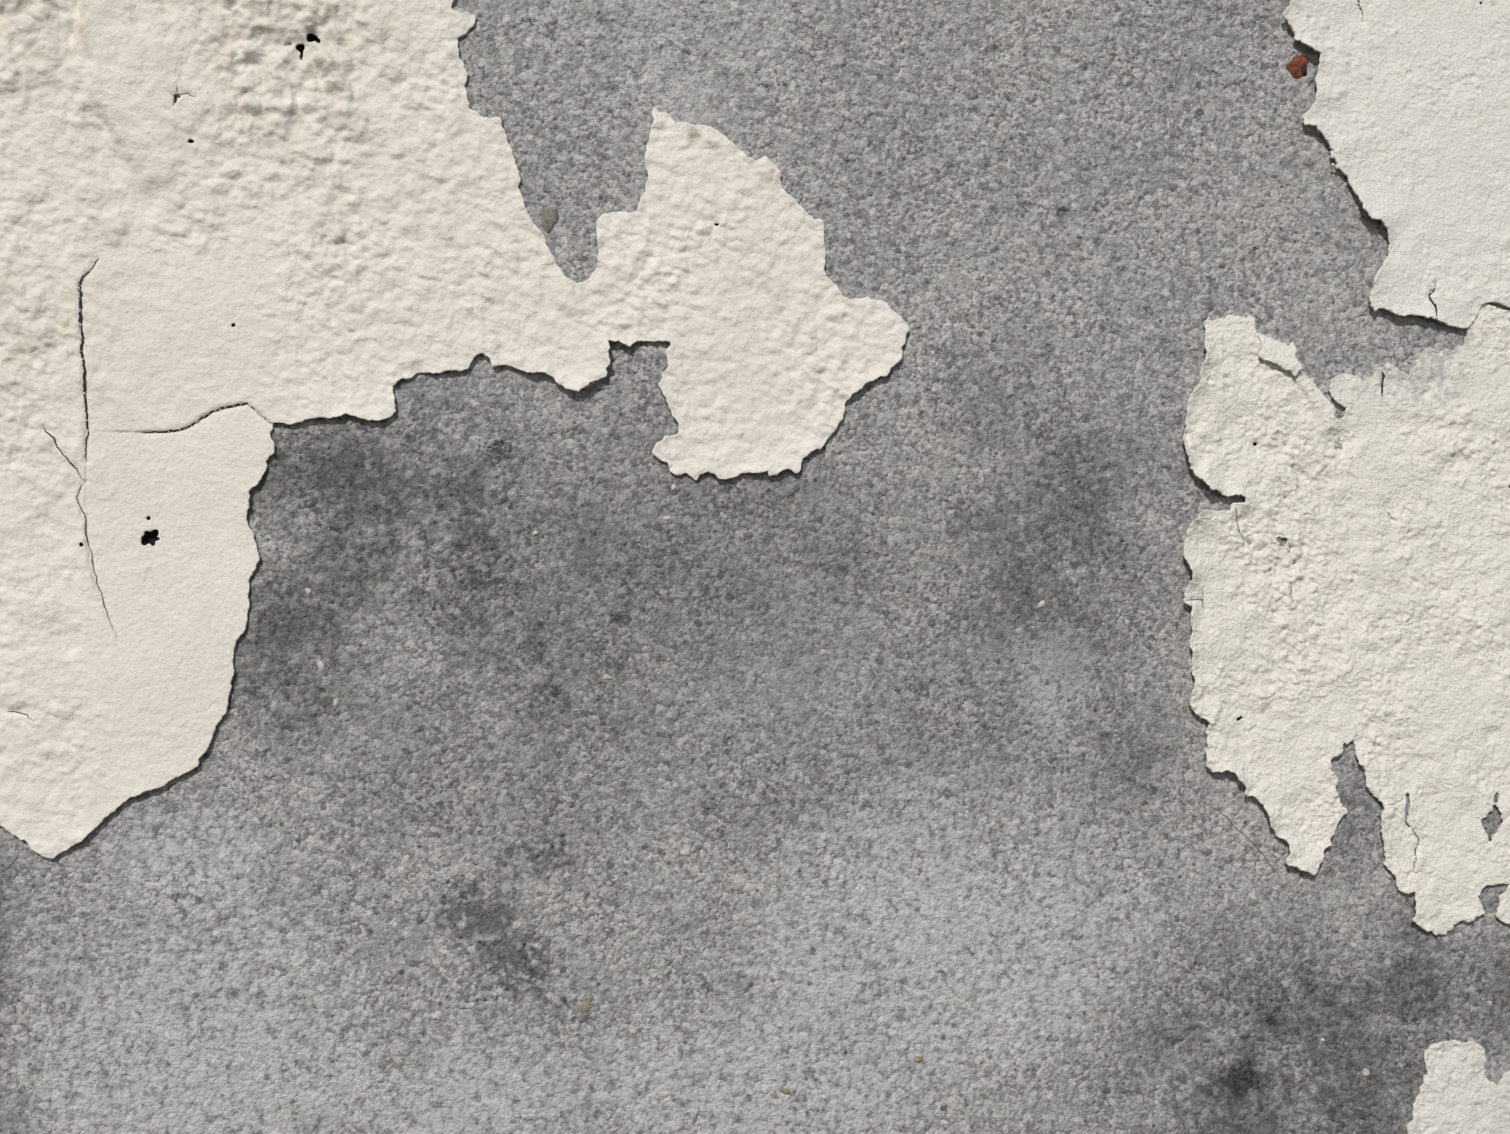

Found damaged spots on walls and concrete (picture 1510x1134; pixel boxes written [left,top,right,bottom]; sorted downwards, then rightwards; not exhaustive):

corrosion [1286,55,1308,79]
spalling [1051,204,1075,223]
crack [43,258,117,637]
crack [145,402,270,433]
peeling [0,0,909,859]
peeling [1183,0,1510,935]
peeling [1406,1040,1510,1134]